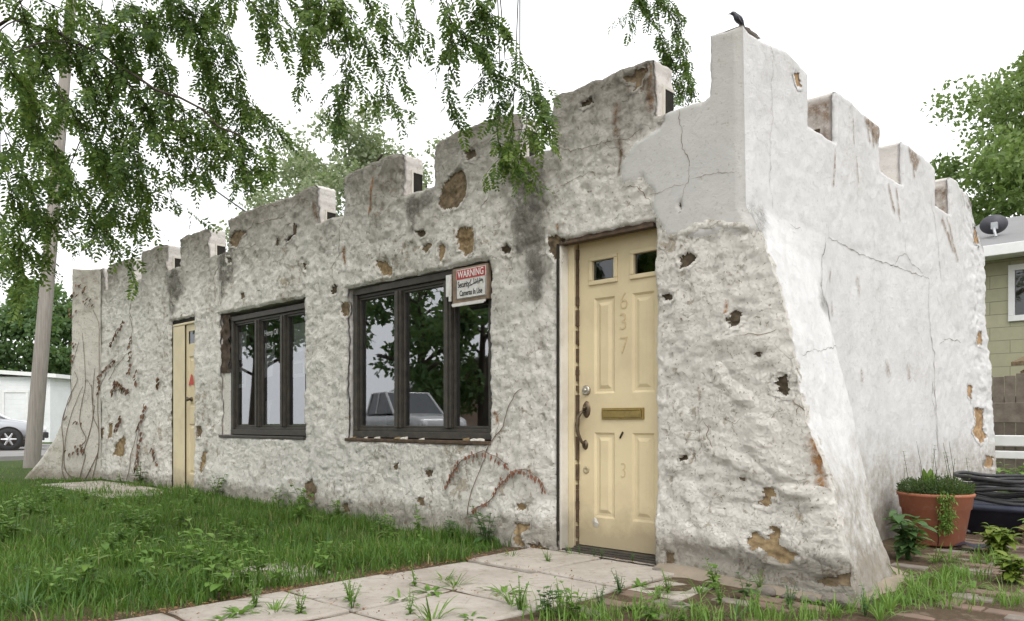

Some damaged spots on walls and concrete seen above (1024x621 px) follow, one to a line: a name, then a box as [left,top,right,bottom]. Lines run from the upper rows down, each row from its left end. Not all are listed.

peeling [792,68,803,91]
peeling [373,256,395,280]
peeling [413,144,479,266]
leakage [502,158,544,300]
crack [623,112,737,209]
spalling [720,305,751,334]
crack [822,204,961,455]
peeling [101,420,126,458]
spalling [765,369,798,401]
peeling [967,382,995,471]
peeling [511,496,554,551]
peeling [735,484,853,592]